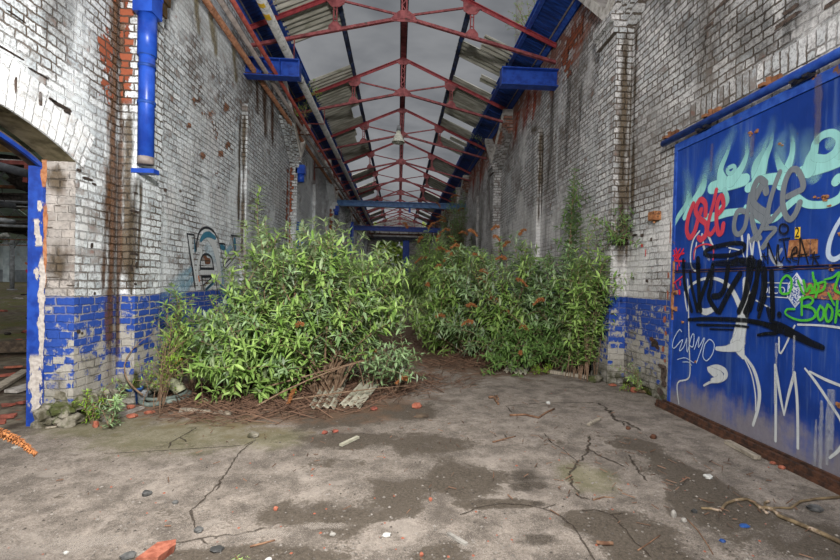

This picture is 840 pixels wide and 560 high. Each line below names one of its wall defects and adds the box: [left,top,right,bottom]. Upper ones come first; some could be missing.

peeling [97,0,134,105]
corrosion [256,80,274,146]
peeling [34,201,45,246]
corrosion [102,0,126,352]
flaking render [28,258,119,429]
crack [505,402,640,430]
spalling [630,337,667,395]
crack [119,428,267,544]
crack [460,433,652,560]